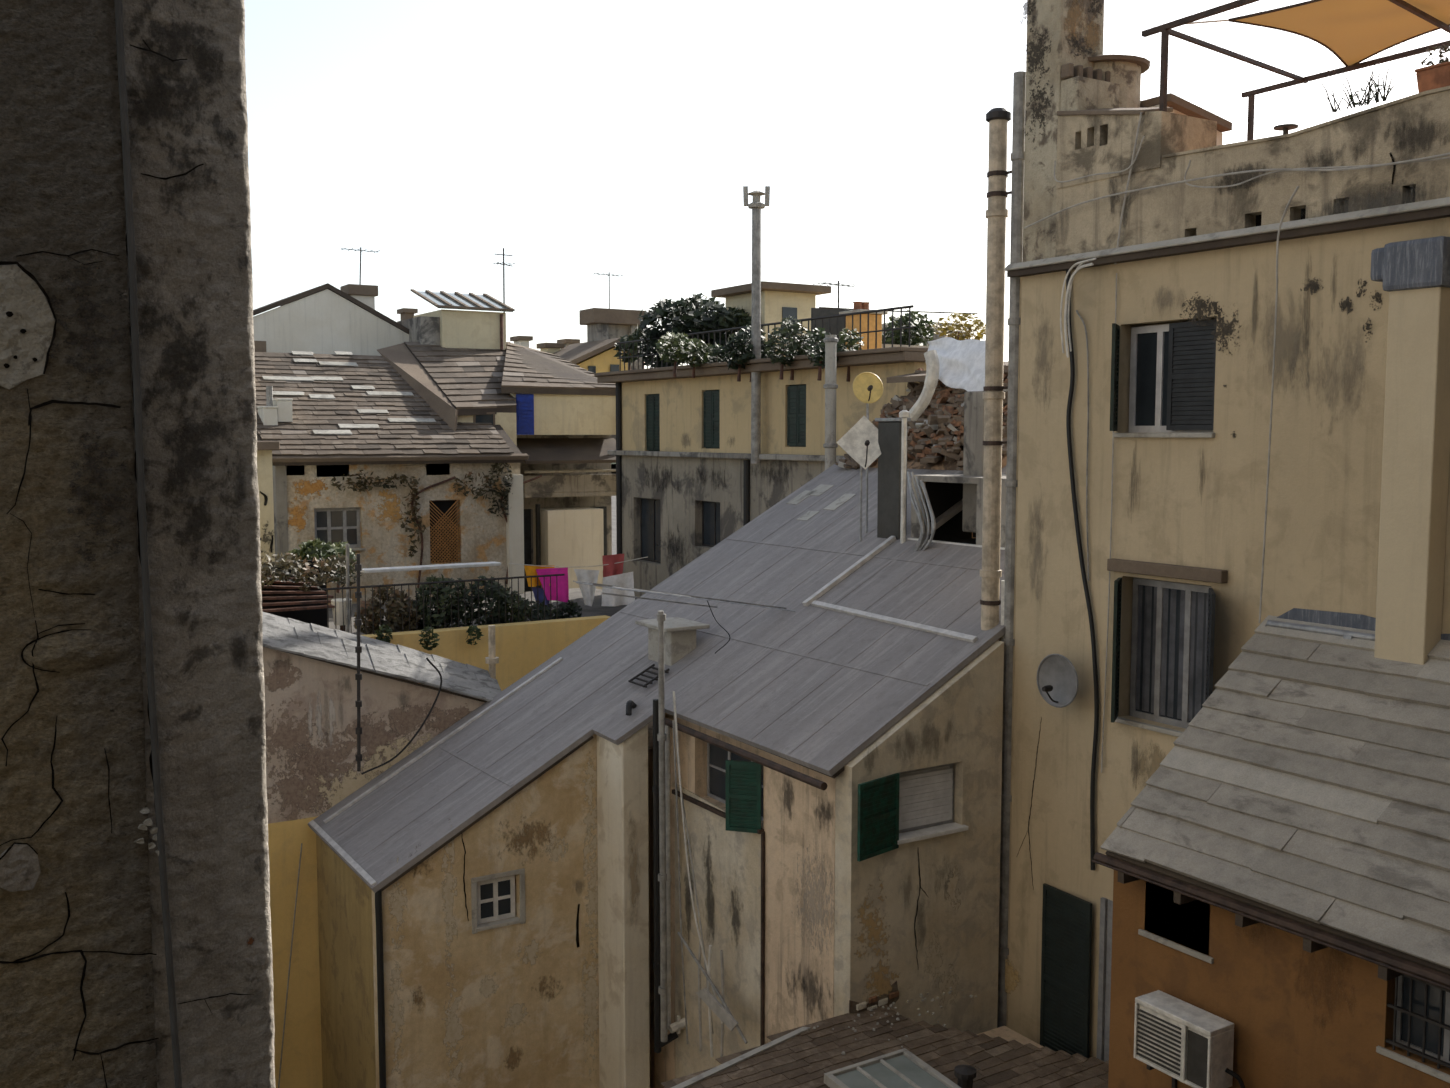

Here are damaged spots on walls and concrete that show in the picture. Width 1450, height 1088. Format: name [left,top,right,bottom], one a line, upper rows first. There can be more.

damp [1064,1,1101,51]
flaking render [0,261,57,390]
crack [0,389,121,846]
flaking render [265,660,470,820]
damp [784,781,793,815]
flaking render [0,842,41,892]
crack [914,852,927,970]
crack [0,892,159,1088]